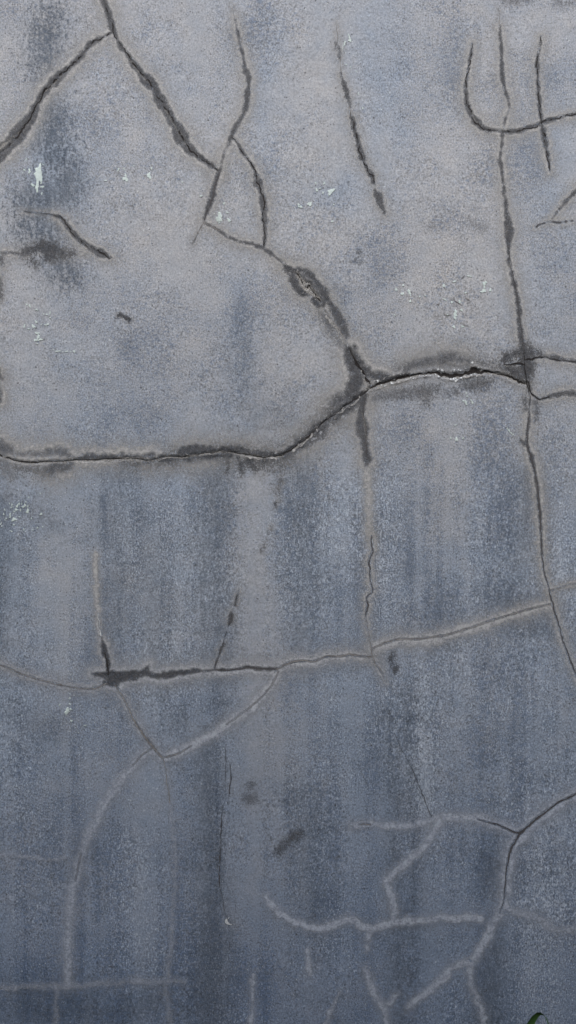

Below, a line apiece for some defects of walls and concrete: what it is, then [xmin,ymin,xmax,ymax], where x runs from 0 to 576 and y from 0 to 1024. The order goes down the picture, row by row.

crack [0,0,576,684]
damp [351,388,376,535]
crack [0,551,552,994]